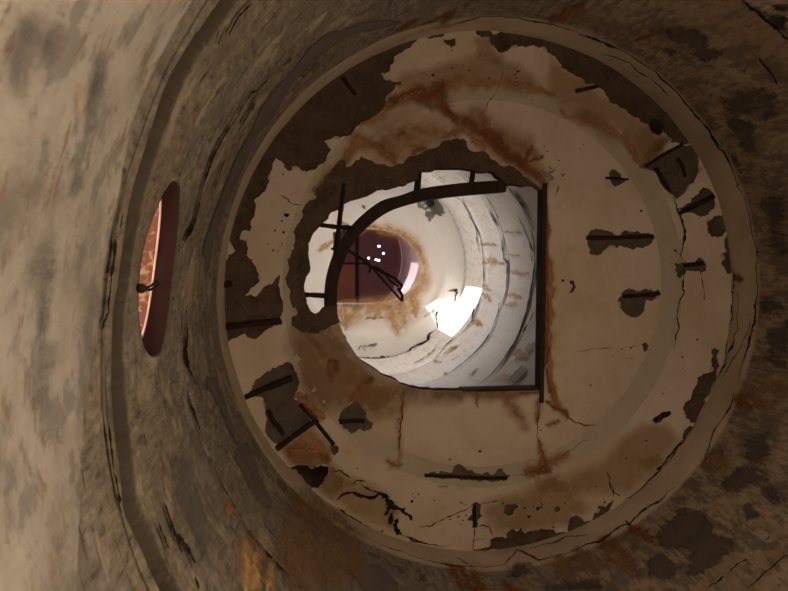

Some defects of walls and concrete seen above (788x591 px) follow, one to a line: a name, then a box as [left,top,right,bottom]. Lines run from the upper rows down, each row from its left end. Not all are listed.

spalling [224,39,539,341]
rust [343,77,555,189]
spalling [476,31,731,274]
rust [434,216,569,426]
crack [332,16,758,568]
spalling [682,348,720,439]
rust [287,429,343,494]
damp [721,431,786,504]
crack [159,503,199,589]
rust [242,536,273,591]
spalling [473,494,614,551]
damp [643,507,733,579]